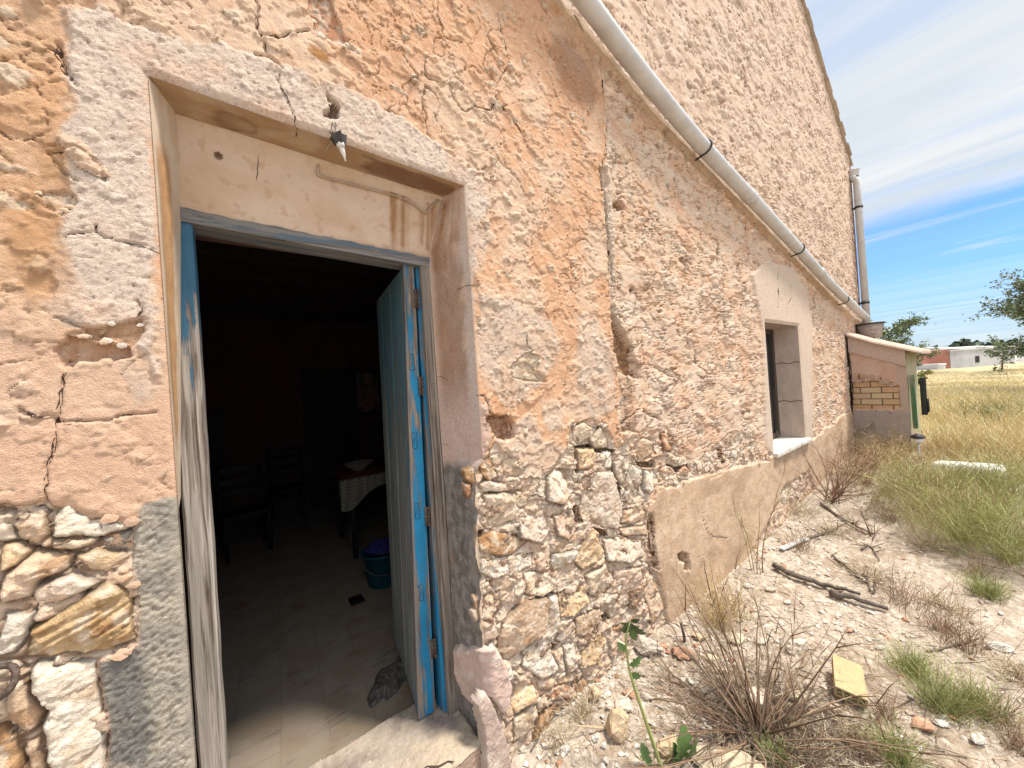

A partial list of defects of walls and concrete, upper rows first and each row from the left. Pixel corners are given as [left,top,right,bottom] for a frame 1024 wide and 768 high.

crack [255,0,308,137]
crack [451,24,524,137]
spalling [57,319,145,370]
crack [23,361,153,499]
spalling [0,500,141,768]
spalling [453,412,768,760]